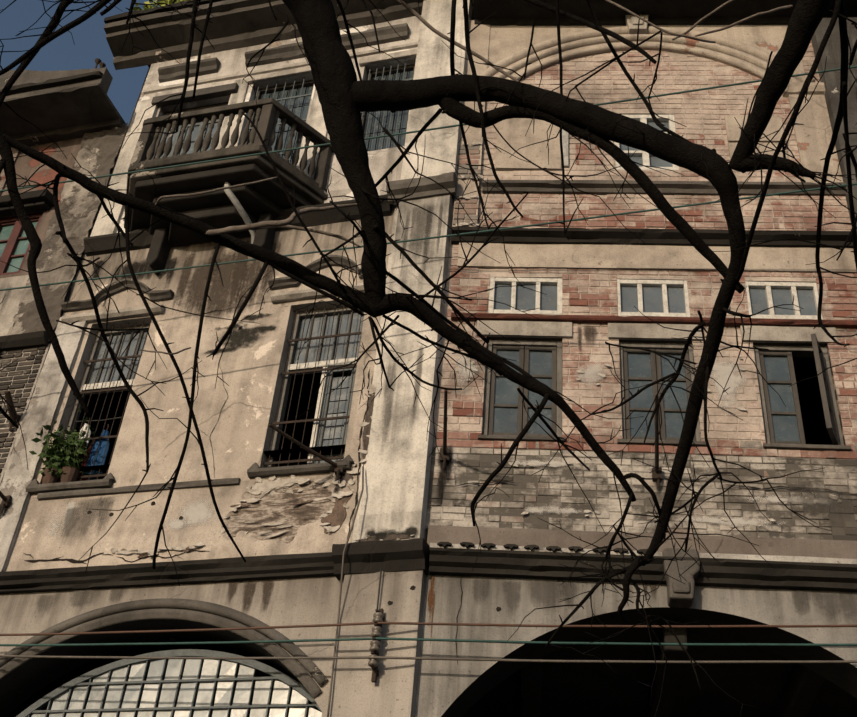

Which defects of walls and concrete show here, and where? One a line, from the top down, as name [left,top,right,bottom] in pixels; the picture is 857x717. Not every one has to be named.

flaking render [213,385,376,543]
damp [228,580,273,610]
damp [531,581,574,604]